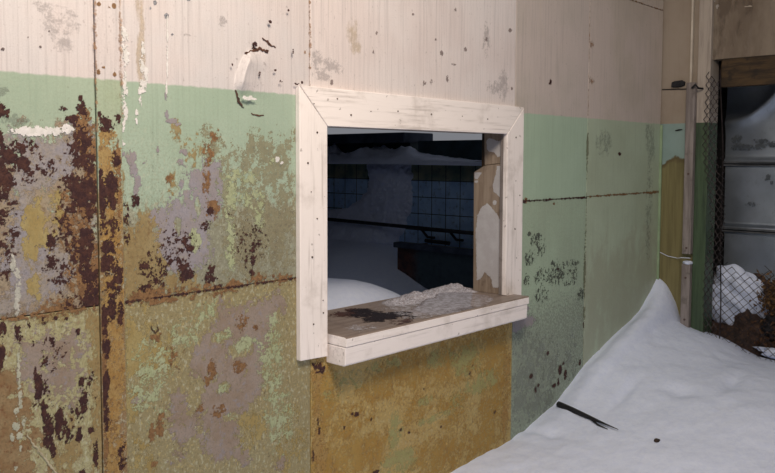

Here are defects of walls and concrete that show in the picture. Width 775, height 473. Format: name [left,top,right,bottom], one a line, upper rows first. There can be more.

corrosion [93,0,122,61]
peeling [121,25,149,196]
peeling [0,115,98,473]
corrosion [0,61,296,473]
peeling [127,123,296,468]
peeling [476,138,501,288]
corrosion [523,190,659,216]